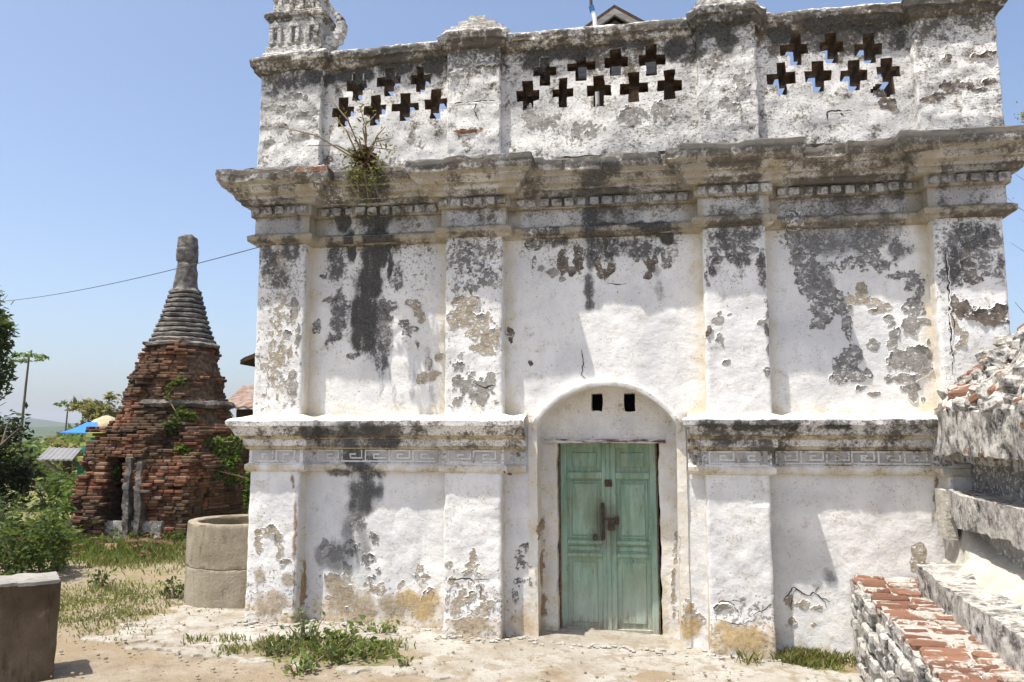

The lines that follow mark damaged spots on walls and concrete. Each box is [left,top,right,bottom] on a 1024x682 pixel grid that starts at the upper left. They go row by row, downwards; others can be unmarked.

leakage [325,162,430,402]
flaking render [377,228,515,408]
leakage [545,157,674,310]
flaking render [783,207,1024,404]
crack [945,256,955,375]
leakage [697,420,800,432]
leakage [821,422,851,430]
flaking render [253,523,292,565]
leakage [301,421,438,620]
flaking render [318,517,496,632]
flaking render [670,531,733,628]
crack [713,587,830,625]